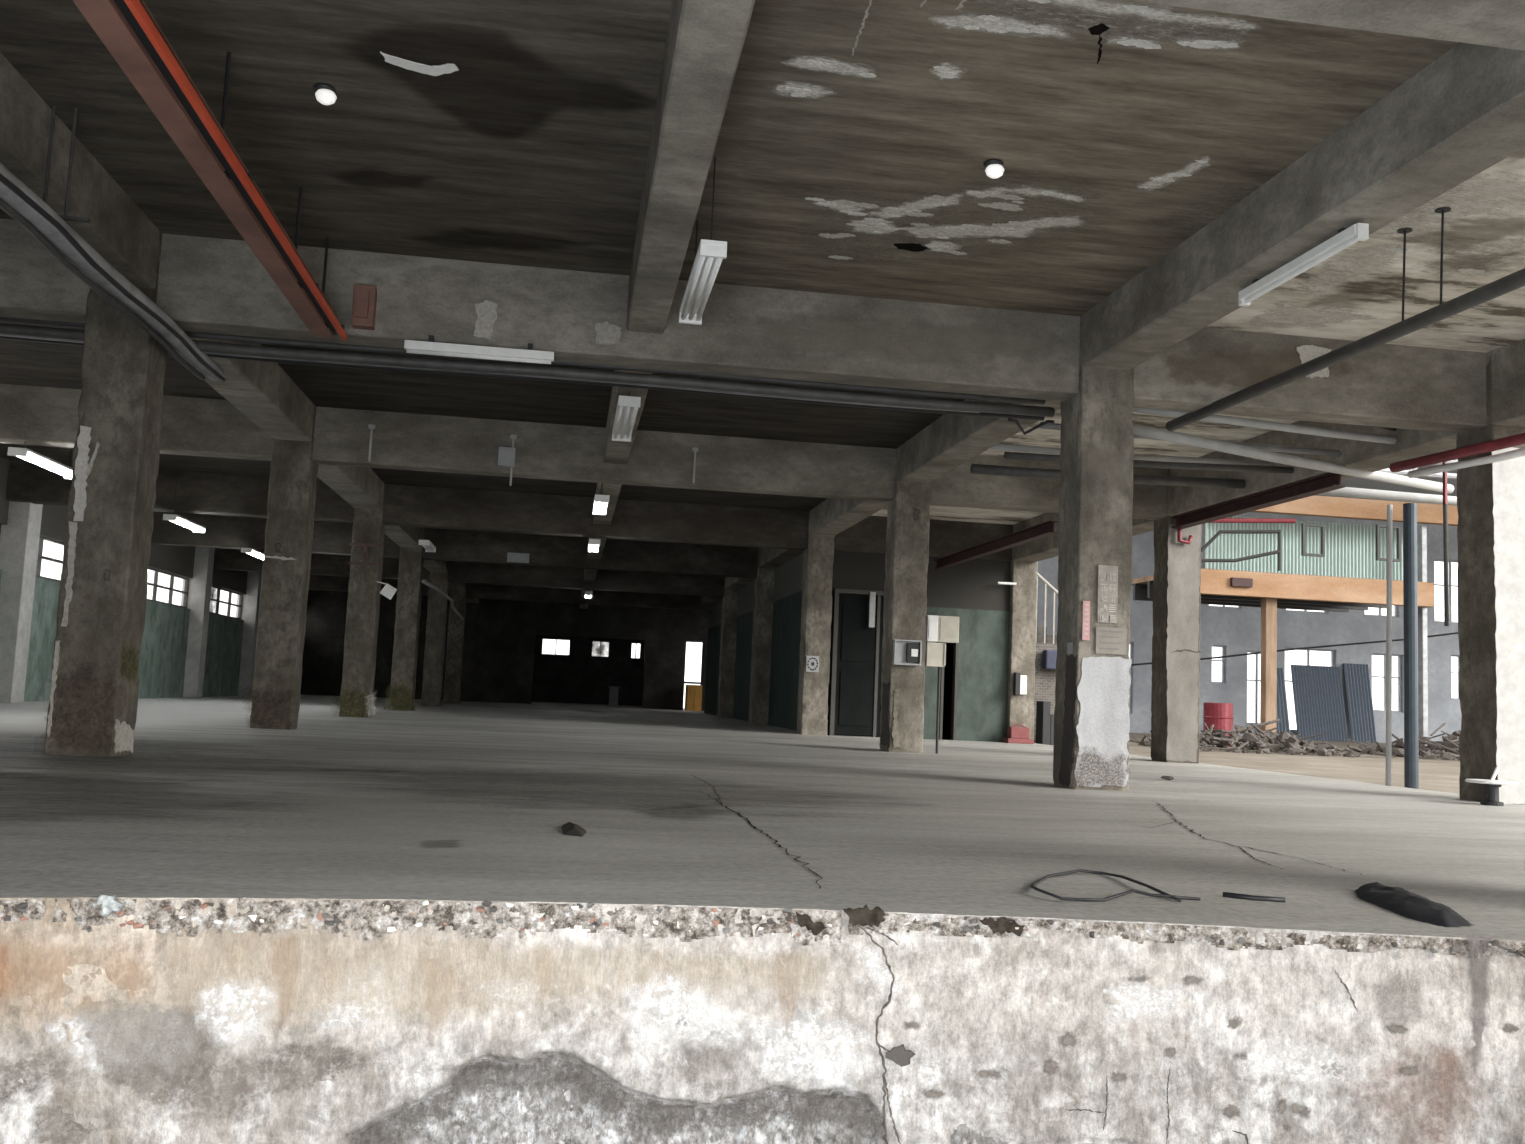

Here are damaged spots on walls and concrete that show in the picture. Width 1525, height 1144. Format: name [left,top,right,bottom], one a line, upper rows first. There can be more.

peeling [776,57,876,98]
peeling [931,62,962,79]
peeling [805,179,1104,261]
crack [659,775,822,889]
spalling [0,894,1525,959]
spalling [1184,976,1201,985]
crack [858,924,915,1144]
spalling [351,1052,883,1144]
spalling [924,1090,945,1098]
spalling [974,1070,1001,1078]
spalling [1223,1105,1239,1118]
spalling [1278,1100,1310,1129]